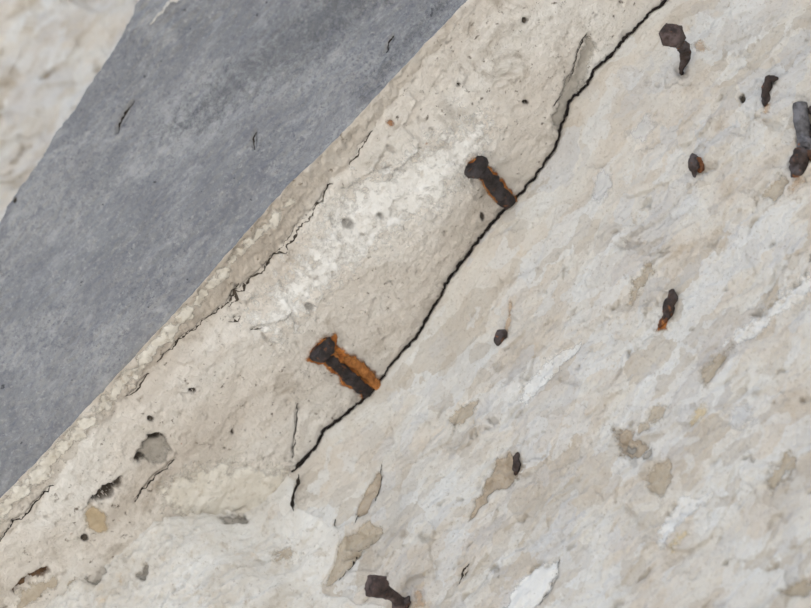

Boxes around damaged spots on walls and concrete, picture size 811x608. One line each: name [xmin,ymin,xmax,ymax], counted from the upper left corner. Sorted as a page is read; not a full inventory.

crack [290,0,667,511]
crack [126,183,332,396]
corrosion [306,334,381,398]
spalling [134,432,171,463]
crack [0,485,54,541]
spalling [90,476,121,499]
crack [134,459,175,502]
corrosion [402,591,423,608]